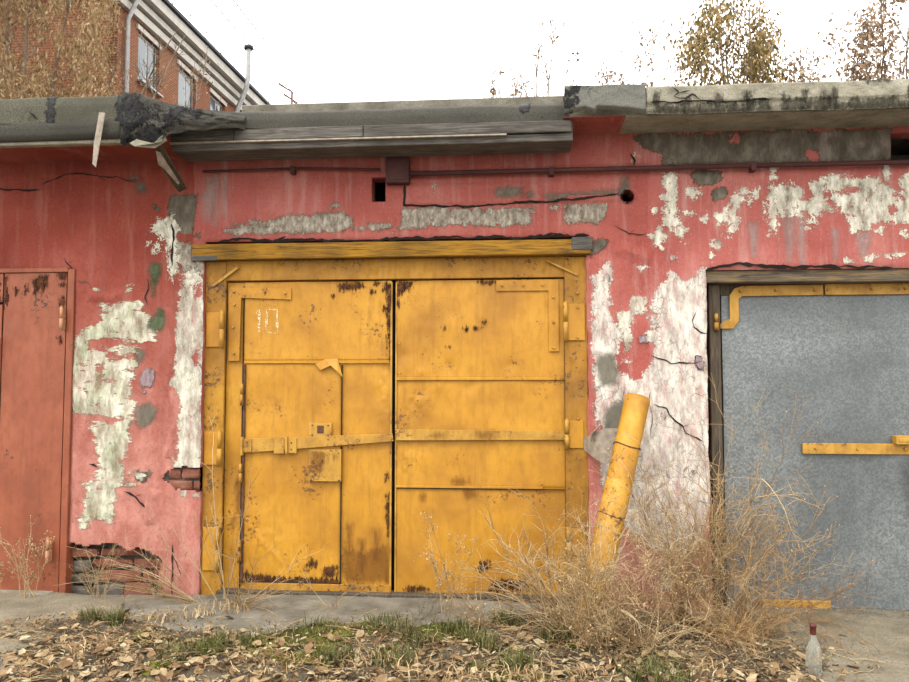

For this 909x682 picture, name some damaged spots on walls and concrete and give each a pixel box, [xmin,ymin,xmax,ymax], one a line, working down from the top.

crack [0,172,133,191]
crack [403,185,620,209]
crack [218,232,589,243]
rust [0,273,67,308]
peeling [145,193,204,499]
peeling [588,128,909,556]
peeling [72,284,158,530]
flaking render [71,542,162,595]